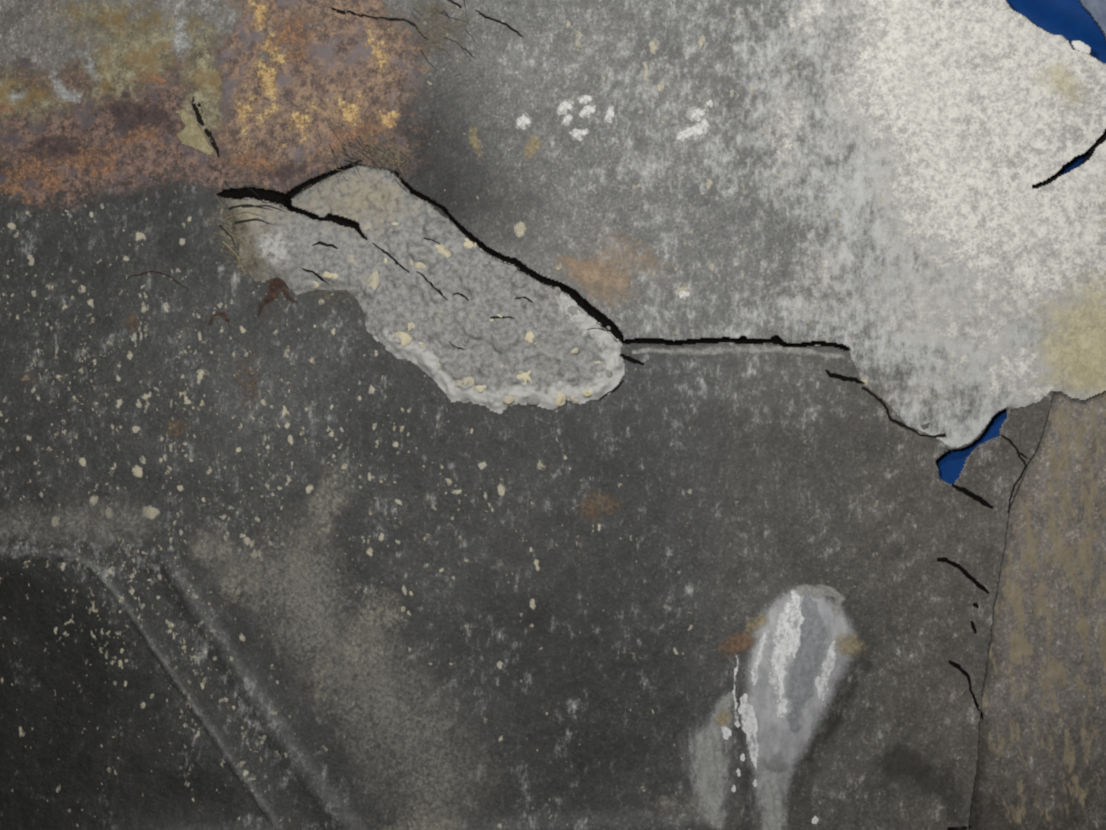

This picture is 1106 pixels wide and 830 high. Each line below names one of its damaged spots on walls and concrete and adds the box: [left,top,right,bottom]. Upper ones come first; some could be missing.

peeling [1071,41,1091,54]
crack [176,96,220,157]
corrosion [0,0,427,208]
crack [209,126,946,438]
crack [951,435,1028,513]
water stain [796,585,844,614]
crack [937,557,990,634]
crack [949,660,983,720]
water stain [656,692,734,829]
water stain [756,760,788,830]
crack [947,822,971,830]